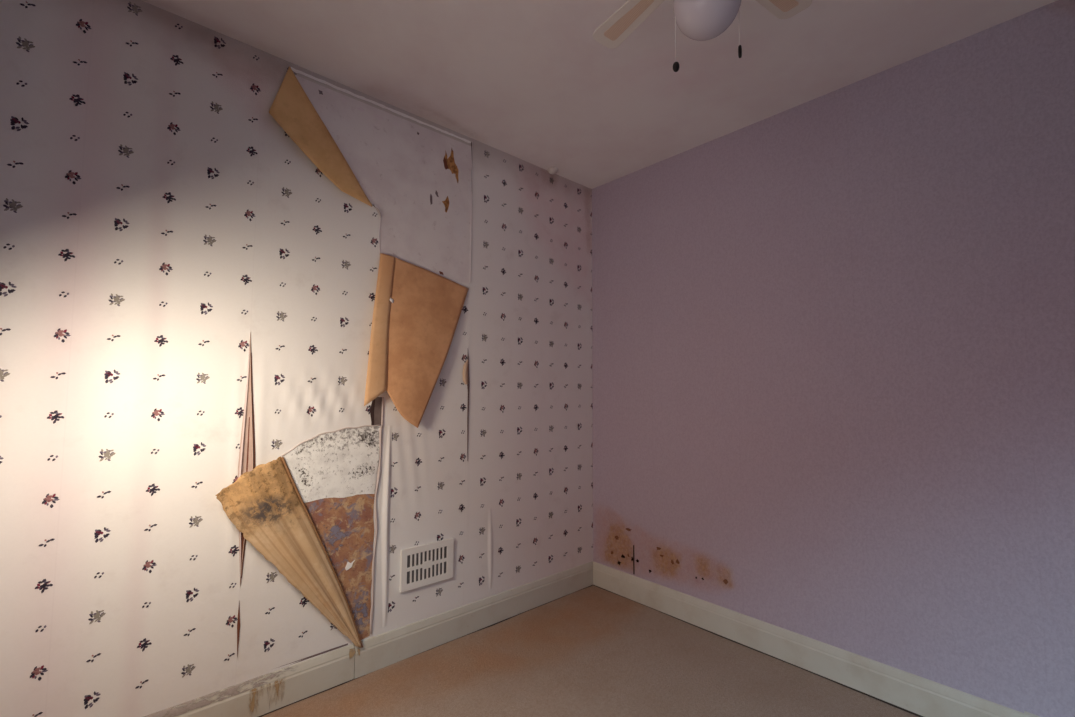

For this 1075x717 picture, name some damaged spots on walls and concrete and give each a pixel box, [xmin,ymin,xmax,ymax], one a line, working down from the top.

peeling [291,67,471,183]